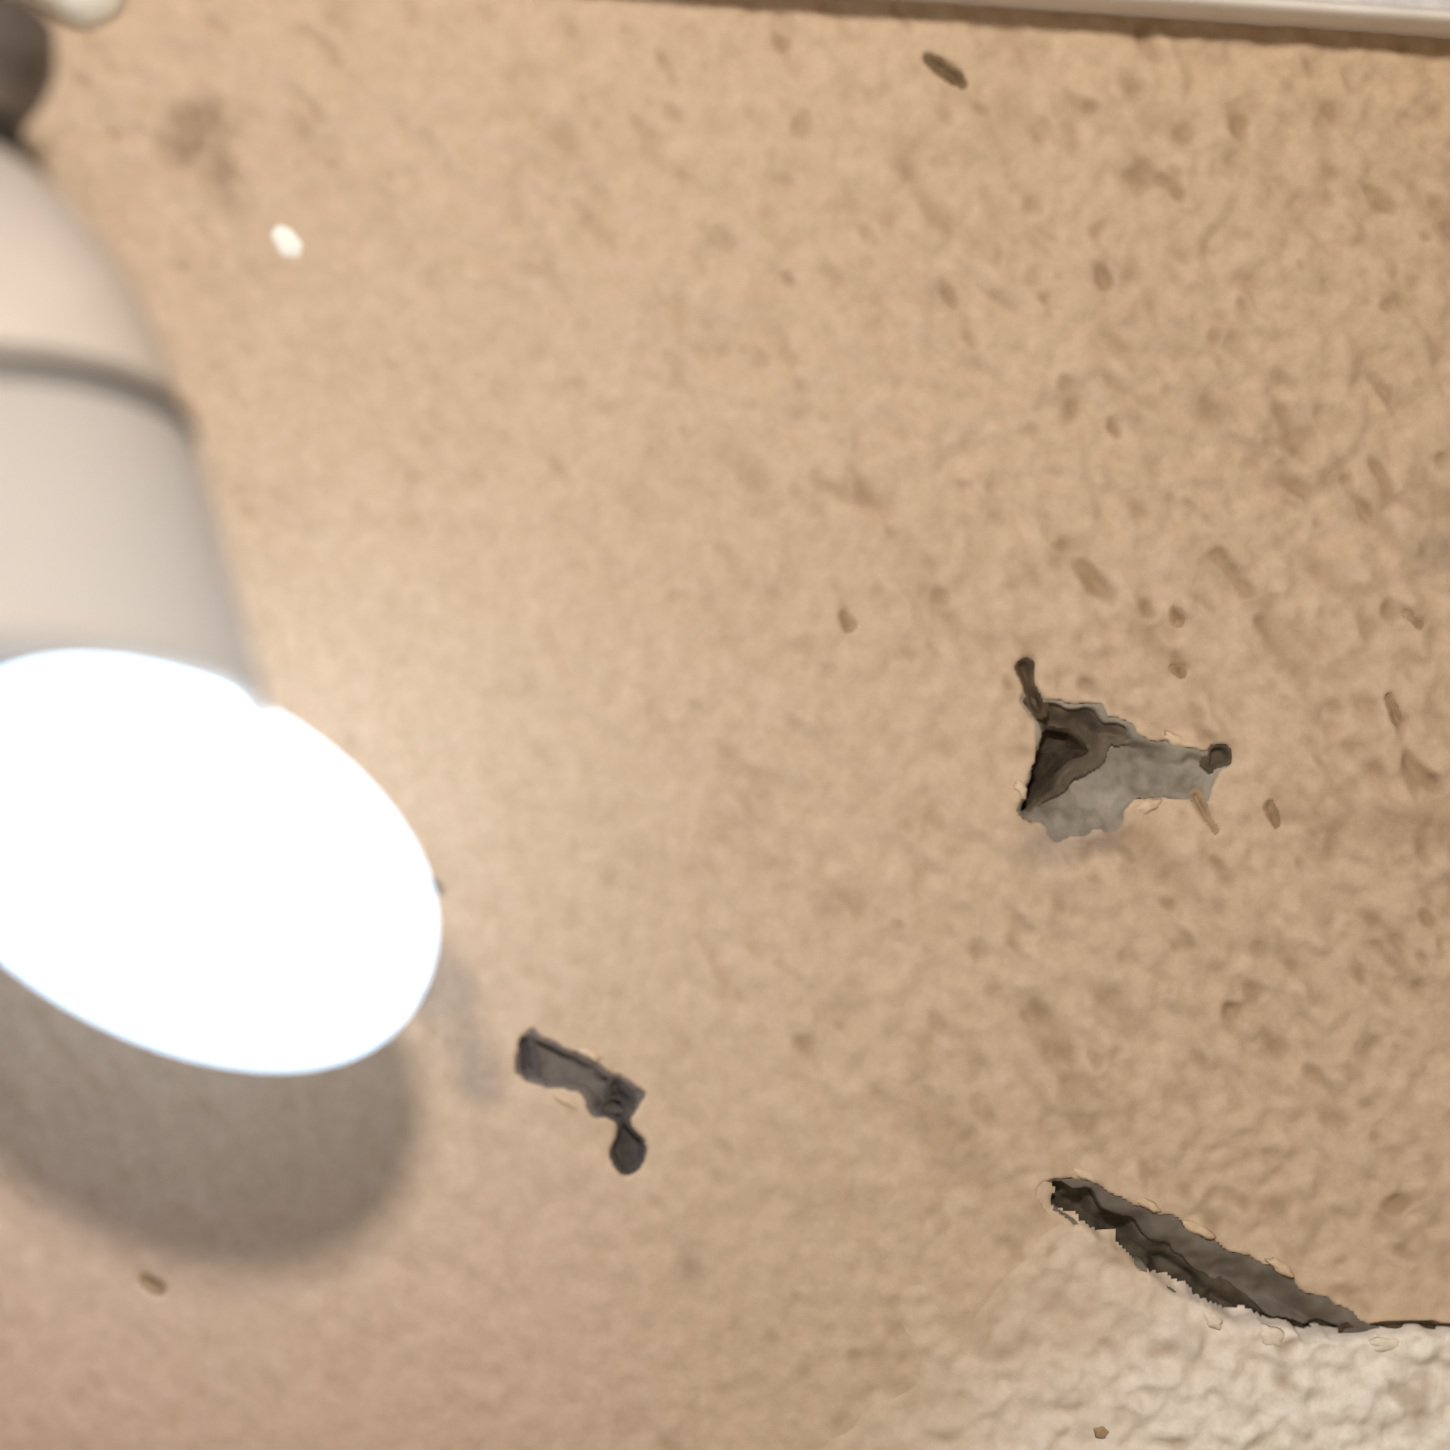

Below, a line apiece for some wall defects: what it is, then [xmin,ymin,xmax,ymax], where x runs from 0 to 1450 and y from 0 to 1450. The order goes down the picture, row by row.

flaking render [1013,657,1232,842]
flaking render [515,1028,647,1175]
crack [1049,1168,1450,1333]